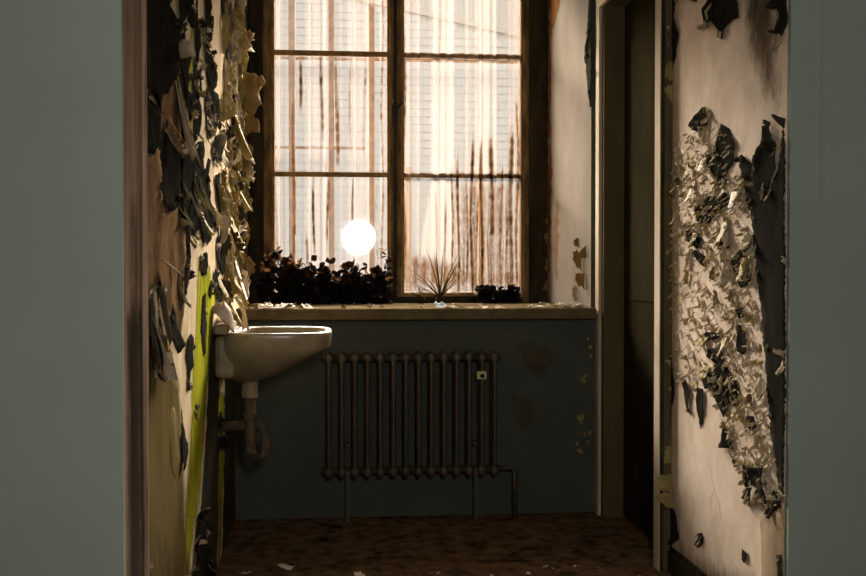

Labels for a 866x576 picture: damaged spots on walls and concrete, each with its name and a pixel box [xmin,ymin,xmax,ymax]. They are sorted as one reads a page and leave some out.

peeling [664,0,739,103]
peeling [765,0,788,52]
peeling [147,0,266,391]
peeling [526,238,587,308]
peeling [664,107,787,519]
peeling [192,507,218,576]
peeling [655,446,679,546]